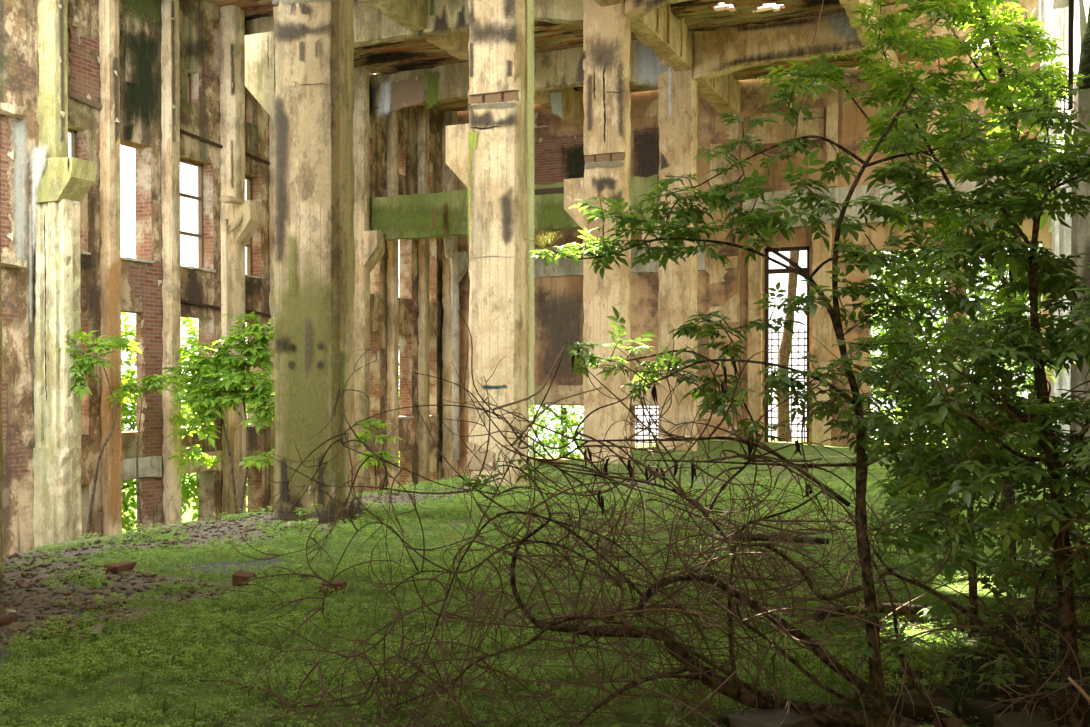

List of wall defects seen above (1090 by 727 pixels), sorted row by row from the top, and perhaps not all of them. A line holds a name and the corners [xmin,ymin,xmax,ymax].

peeling [58,0,120,141]
damp [121,0,160,26]
peeling [0,115,14,253]